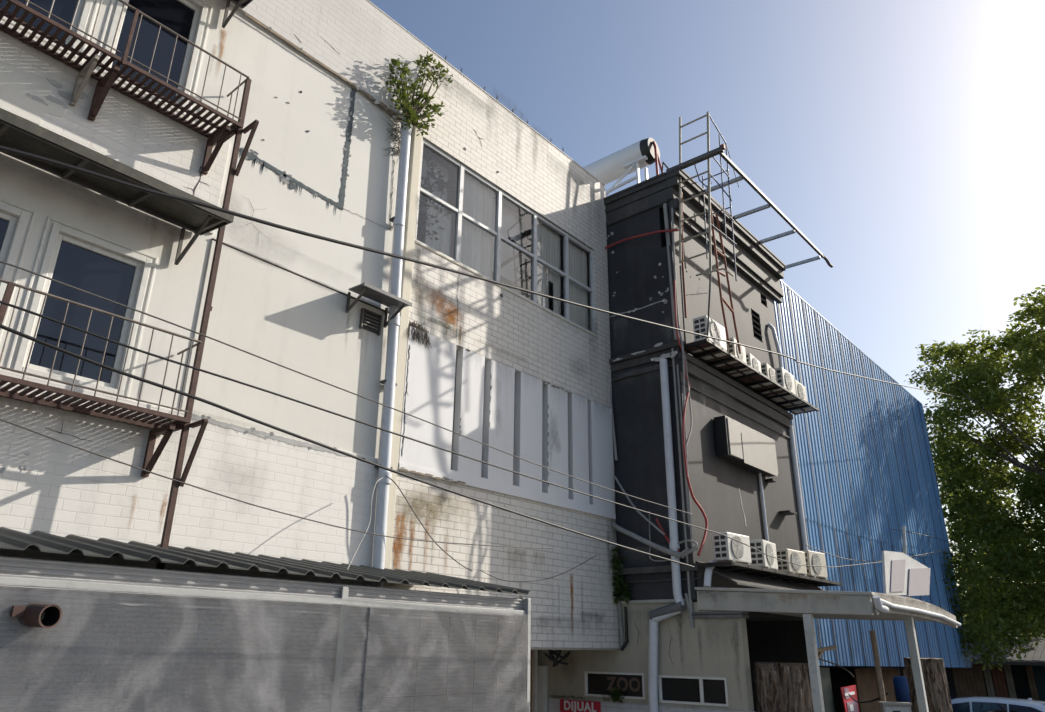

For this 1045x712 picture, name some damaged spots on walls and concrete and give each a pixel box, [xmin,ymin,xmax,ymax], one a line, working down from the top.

peeling [240,13,402,214]
corrosion [434,296,462,338]
corrosion [393,515,429,566]